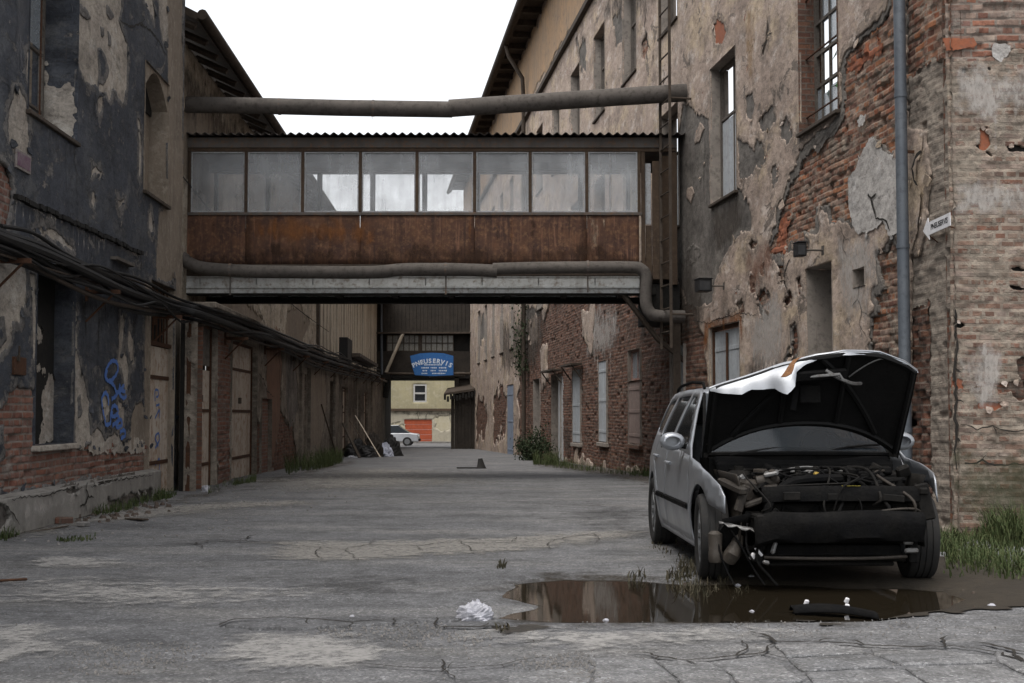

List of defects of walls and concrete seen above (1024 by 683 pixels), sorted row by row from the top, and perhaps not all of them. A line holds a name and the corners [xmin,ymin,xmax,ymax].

peeling [8,52,33,155]
peeling [44,0,130,137]
flaking render [476,0,1024,534]
crack [867,193,890,231]
flaking render [0,264,154,529]
crack [645,631,1024,664]